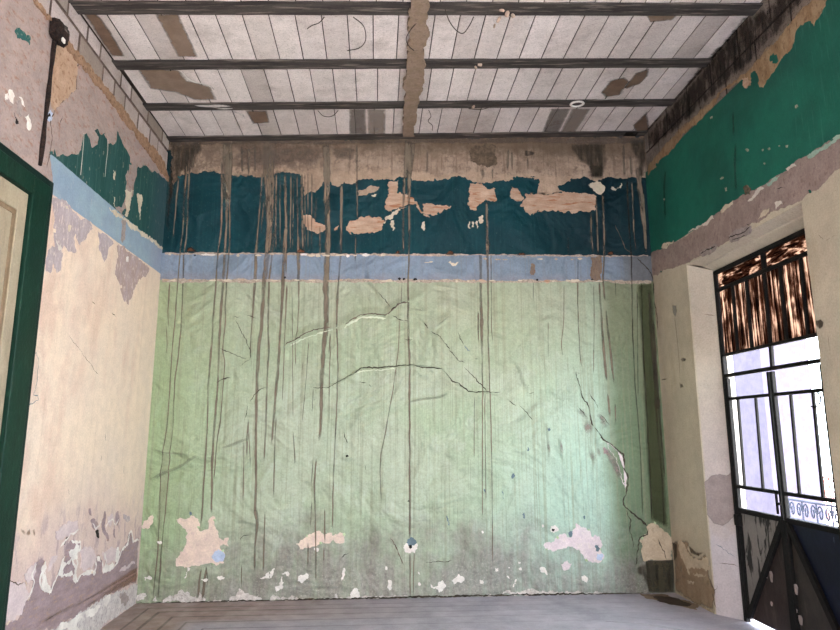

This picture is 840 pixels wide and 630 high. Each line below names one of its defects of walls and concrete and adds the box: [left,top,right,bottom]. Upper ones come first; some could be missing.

water stain [85,15,124,56]
water stain [157,14,196,57]
water stain [139,70,215,100]
peeling [0,0,840,305]
water stain [167,0,800,579]
crack [313,292,534,419]
crack [576,374,667,564]
peeling [6,508,139,625]
peeling [176,512,229,578]
water stain [330,555,415,599]
peeling [542,516,604,563]
flaking render [640,522,672,561]